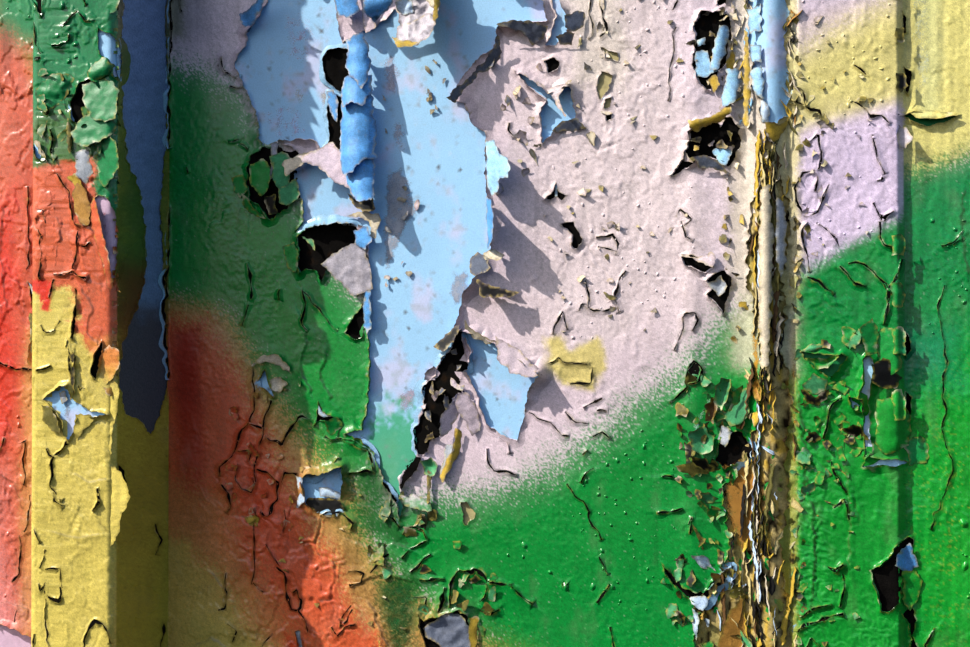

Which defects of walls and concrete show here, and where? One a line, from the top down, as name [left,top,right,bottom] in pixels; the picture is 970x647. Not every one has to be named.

crack [0,435,73,647]
crack [0,104,94,391]
peeling [21,0,171,546]
crack [80,616,114,647]
crack [214,364,537,647]
peeling [229,0,629,537]
peeling [400,572,498,647]
crack [523,230,630,605]
crack [659,559,737,640]
peeling [660,0,869,647]
peeling [892,326,916,361]
peeling [895,543,923,610]